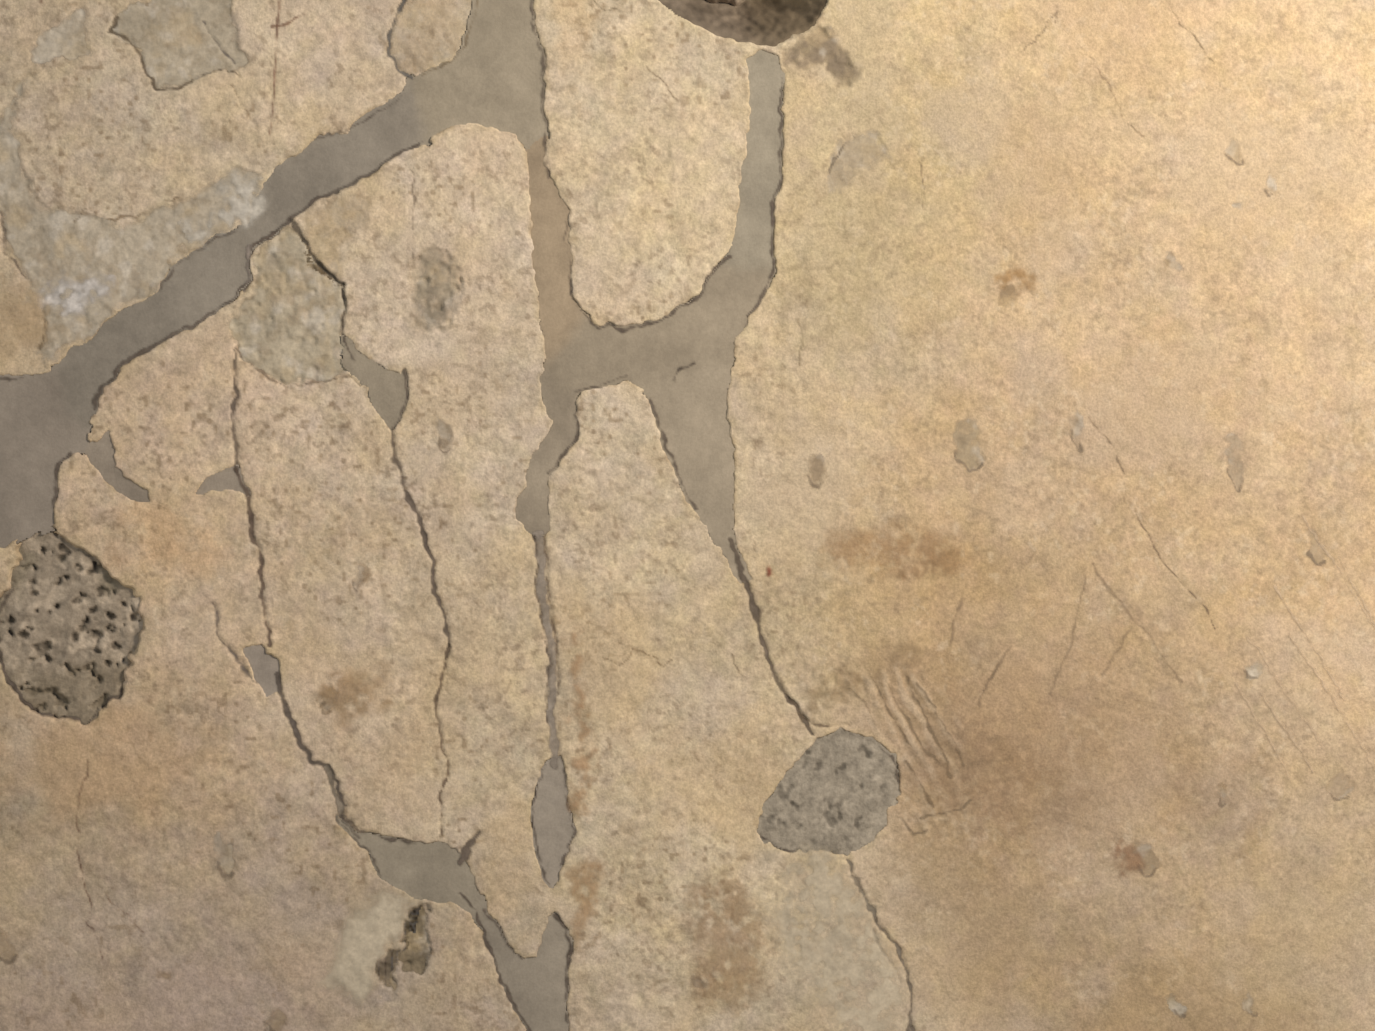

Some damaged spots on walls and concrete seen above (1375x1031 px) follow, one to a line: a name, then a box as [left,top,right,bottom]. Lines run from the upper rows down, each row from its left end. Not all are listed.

flaking render [109,0,249,90]
flaking render [387,0,413,79]
spalling [658,0,856,78]
flaking render [0,81,260,359]
flaking render [230,221,347,384]
flaking render [416,254,456,323]
crack [0,0,828,769]
flaking render [0,529,143,725]
crack [216,350,574,1031]
flaking render [376,905,431,990]
crack [847,859,915,1031]